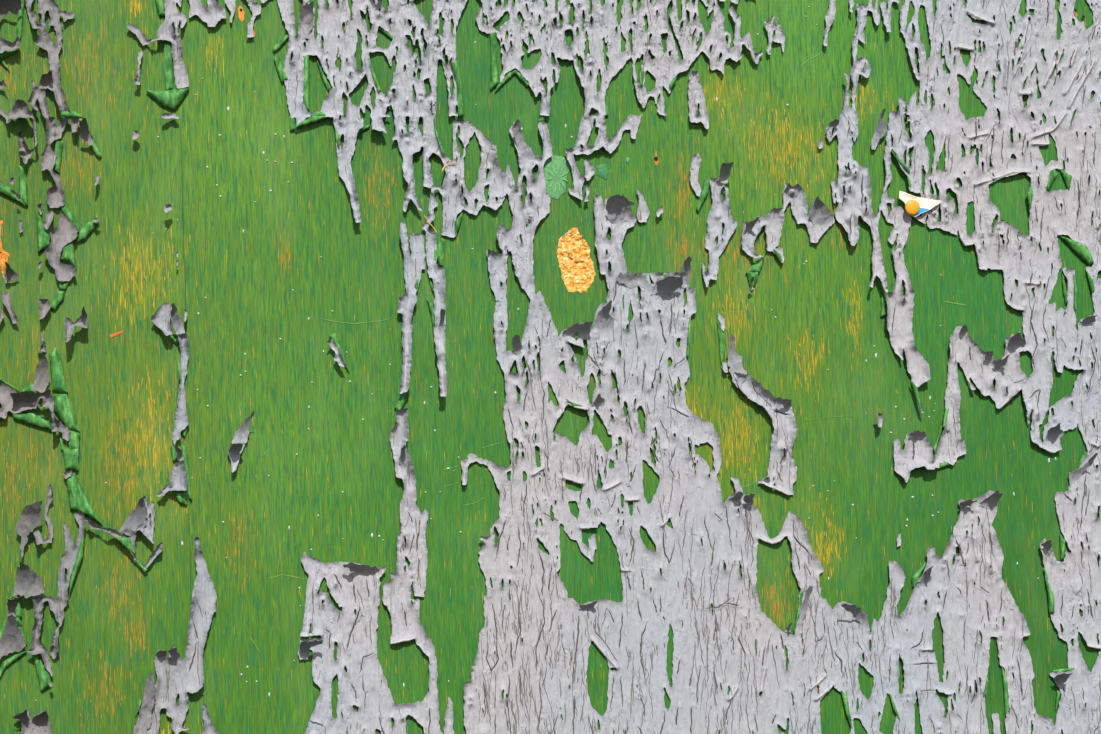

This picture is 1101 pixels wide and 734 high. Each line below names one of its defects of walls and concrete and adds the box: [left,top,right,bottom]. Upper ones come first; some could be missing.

peeling [126,0,261,89]
peeling [290,0,454,136]
peeling [493,0,727,95]
peeling [397,125,498,397]
peeling [487,249,540,402]
peeling [532,0,1101,612]
peeling [0,303,189,687]
peeling [133,537,218,734]
peeling [586,641,616,730]
peeling [756,536,813,671]
peeling [818,603,923,734]
peeling [932,612,1014,734]